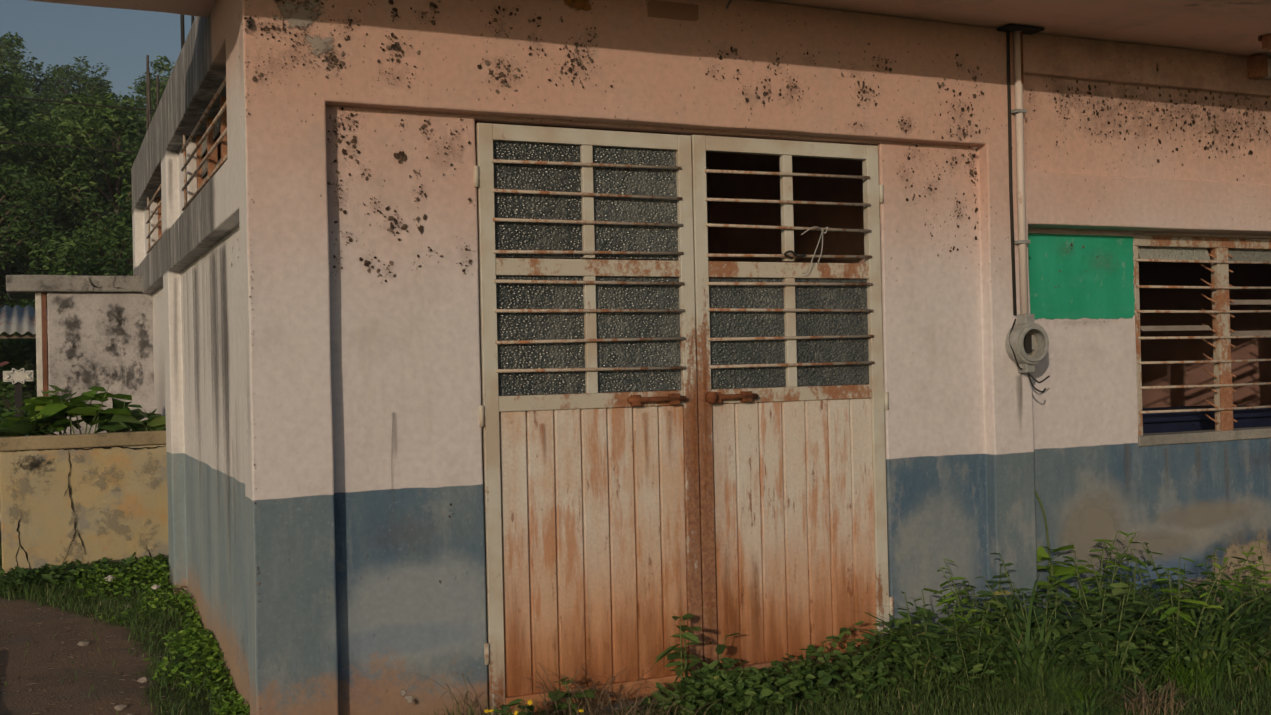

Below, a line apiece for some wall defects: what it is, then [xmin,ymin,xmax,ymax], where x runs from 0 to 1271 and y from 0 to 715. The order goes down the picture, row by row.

water stain [54,297,152,400]
crack [7,446,165,567]
peeling [1069,506,1117,566]
peeling [1180,533,1271,604]